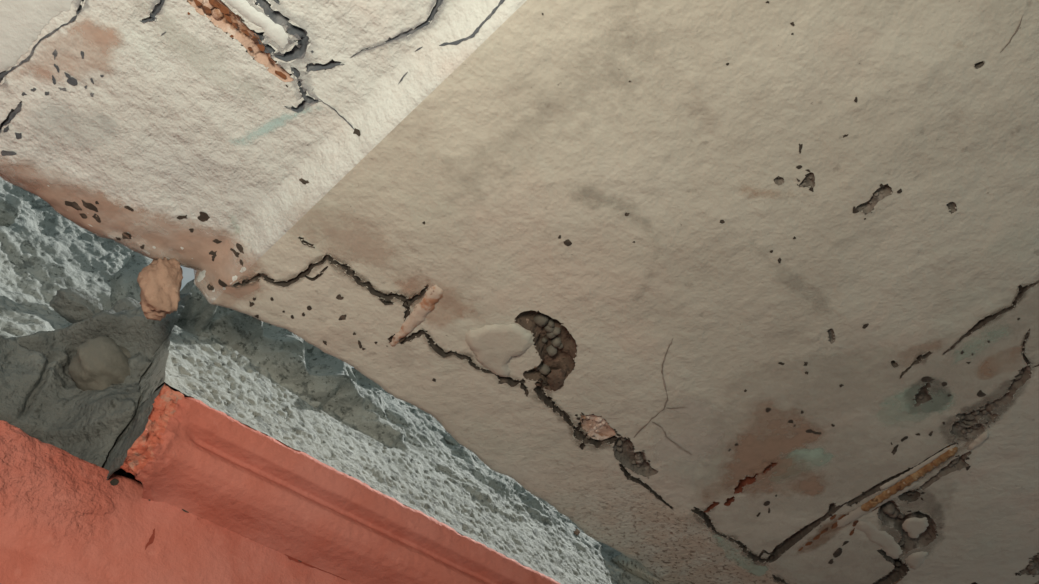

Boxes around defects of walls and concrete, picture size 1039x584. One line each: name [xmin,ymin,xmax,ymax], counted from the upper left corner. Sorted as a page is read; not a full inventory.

crack [0,0,87,83]
crack [141,0,166,35]
crack [254,0,505,129]
crack [0,102,21,133]
spalling [853,184,902,220]
spalling [465,310,577,391]
crack [891,280,1039,379]
crack [228,237,787,584]
spalling [575,412,659,477]
corrosion [704,462,778,513]
spalling [769,366,1032,584]